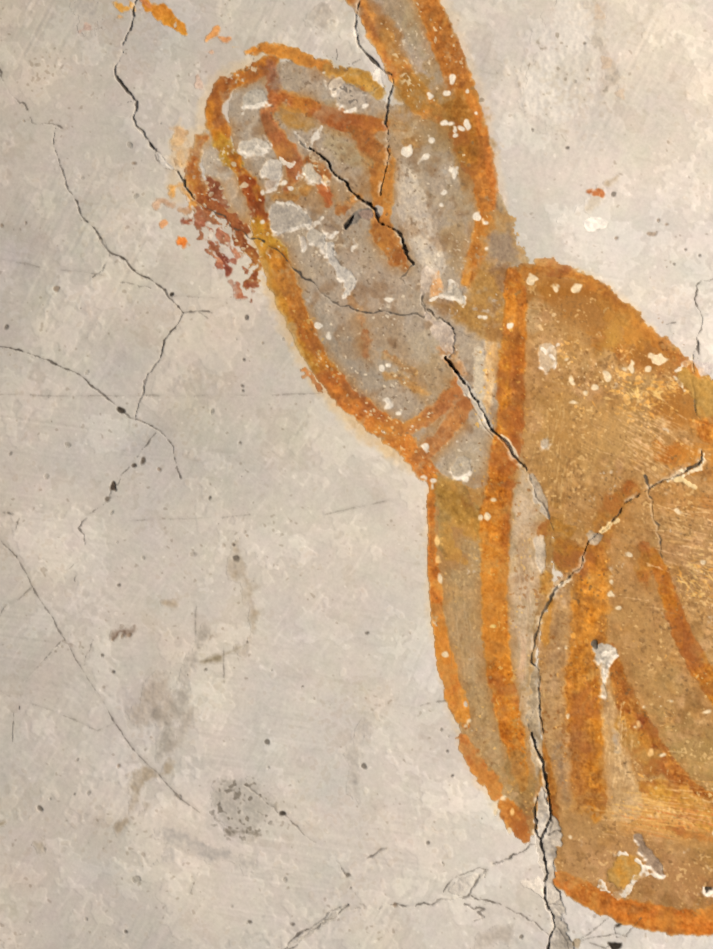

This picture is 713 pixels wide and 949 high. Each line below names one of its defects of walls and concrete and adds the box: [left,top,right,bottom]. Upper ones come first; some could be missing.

peeling [323,72,369,114]
peeling [440,112,479,138]
peeling [237,135,358,300]
crack [115,0,554,575]
peeling [429,280,468,308]
crack [0,99,211,581]
crack [673,279,713,419]
crack [379,451,707,949]
peeling [591,640,619,700]
crack [244,785,315,842]
peeling [597,833,666,901]
crack [286,904,359,949]